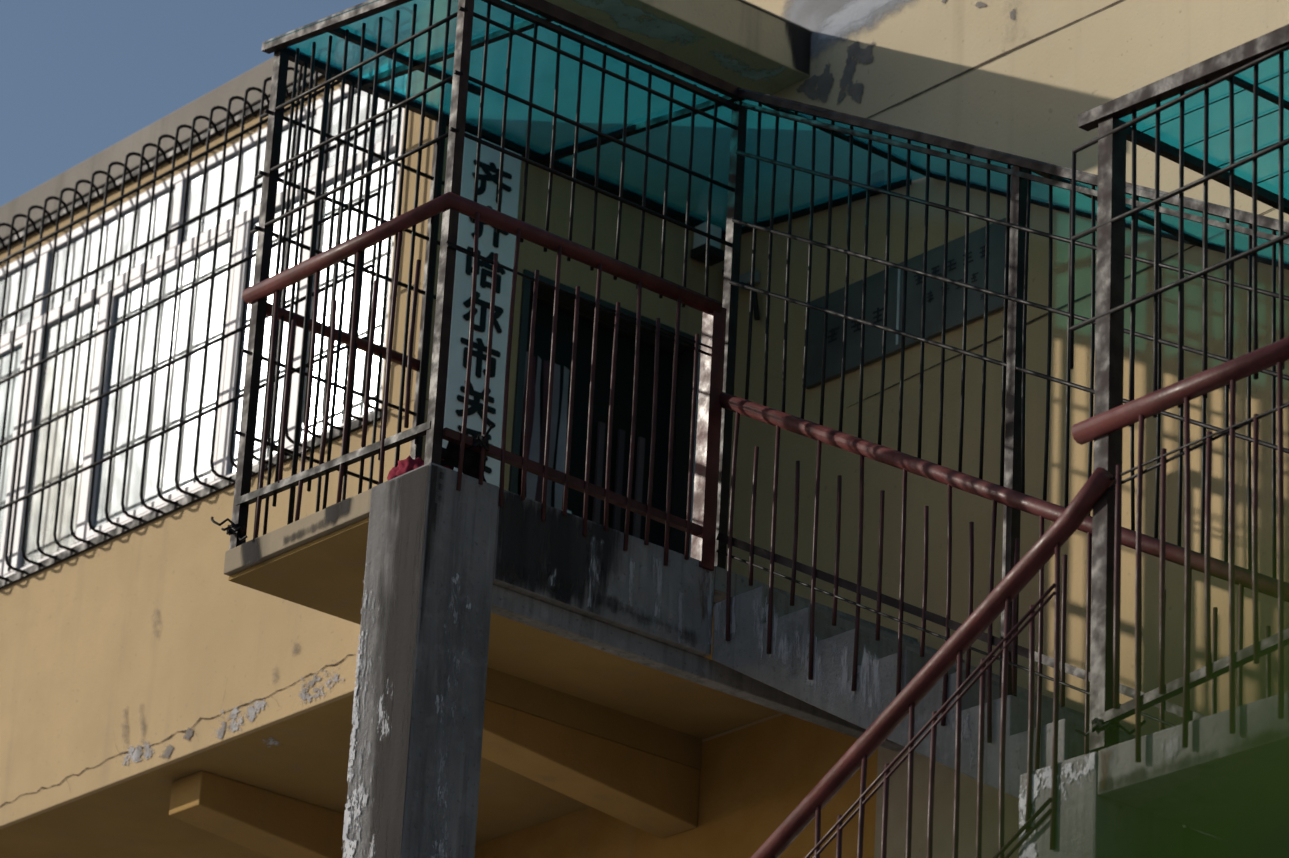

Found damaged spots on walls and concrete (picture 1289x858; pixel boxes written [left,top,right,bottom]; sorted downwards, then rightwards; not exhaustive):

peeling [797,41,874,104]
water stain [495,491,662,619]
peeling [122,727,193,766]
crack [0,654,355,807]
peeling [216,699,267,739]
peeling [299,563,393,858]
peeling [430,573,471,858]